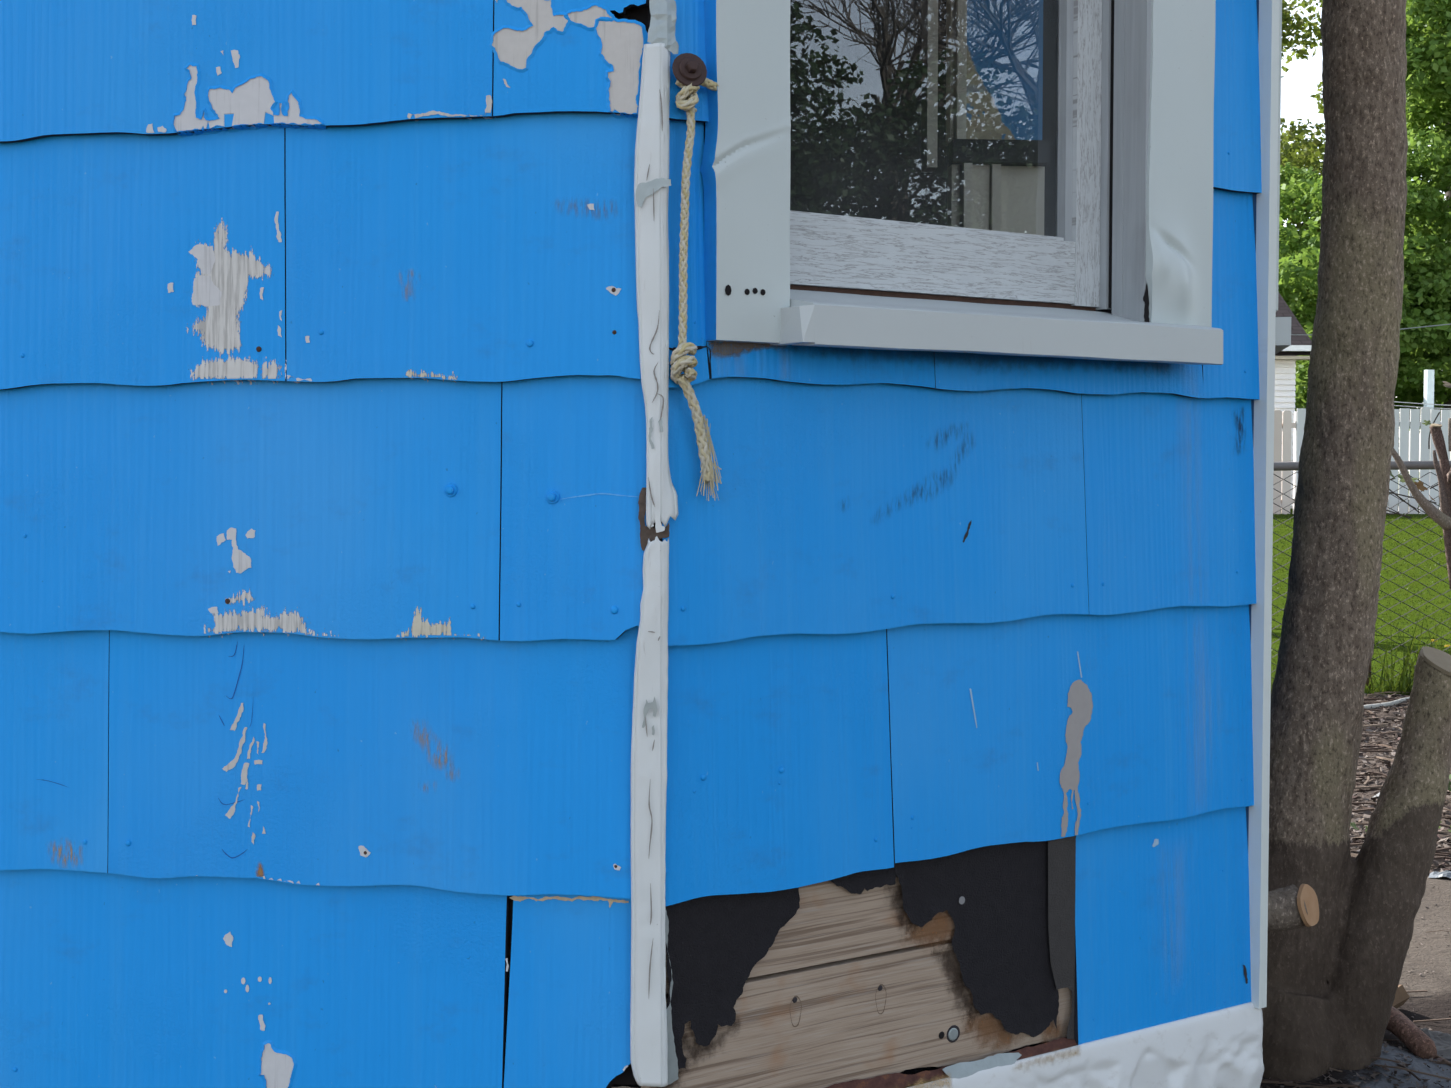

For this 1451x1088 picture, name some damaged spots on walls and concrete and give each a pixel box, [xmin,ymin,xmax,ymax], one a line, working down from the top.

peeling [146,50,326,137]
peeling [407,0,648,120]
peeling [274,211,282,242]
peeling [186,218,312,385]
peeling [204,528,339,639]
peeling [396,606,486,640]
peeling [222,703,268,844]
peeling [258,1003,297,1088]
rust [914,1079,950,1088]
peeling [942,1053,1021,1079]